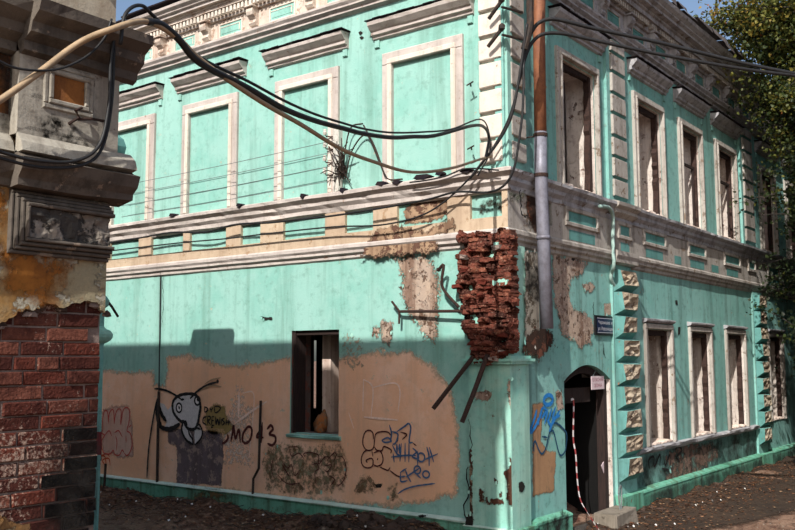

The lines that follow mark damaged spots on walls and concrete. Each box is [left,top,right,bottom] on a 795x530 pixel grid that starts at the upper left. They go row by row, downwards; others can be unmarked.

peeling [22,305,46,317]
spalling [362,199,596,366]
peeling [464,449,512,530]